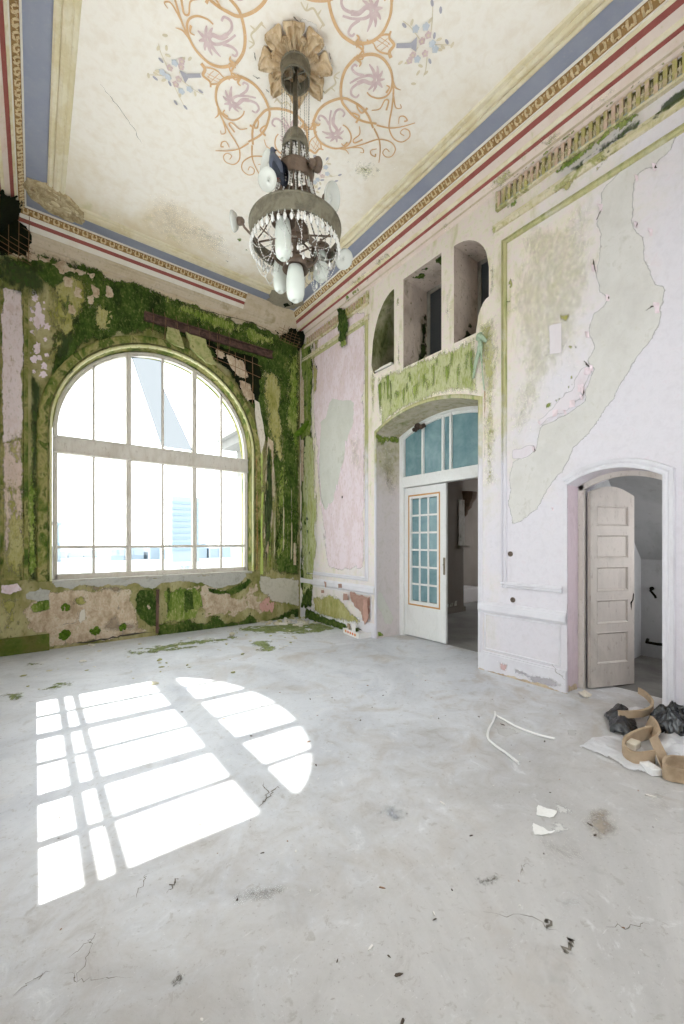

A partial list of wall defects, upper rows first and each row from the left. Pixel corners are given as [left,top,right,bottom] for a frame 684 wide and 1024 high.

flaking render [0,189,114,315]
peeling [508,137,676,524]
peeling [277,313,365,570]
leakage [263,437,298,575]
peeling [1,584,22,594]
flaking render [23,587,147,647]
flaking render [187,576,299,618]
peeling [321,582,393,624]
crack [24,933,129,987]